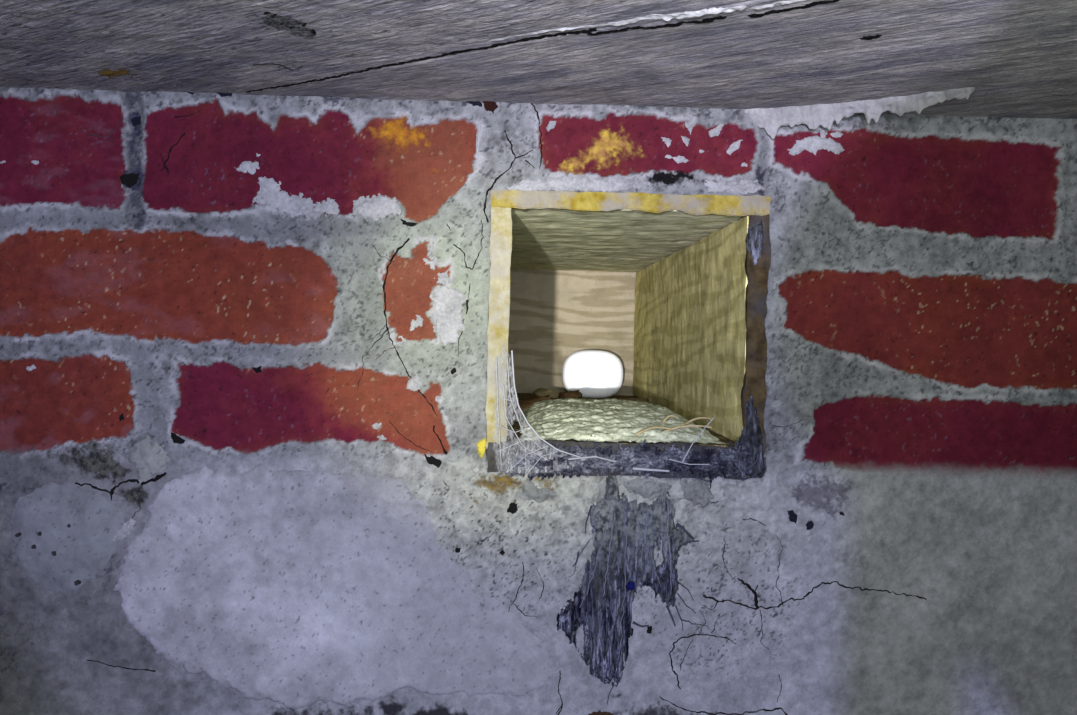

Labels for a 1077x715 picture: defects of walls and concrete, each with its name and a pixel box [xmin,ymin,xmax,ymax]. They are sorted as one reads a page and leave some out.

crack [245,0,839,93]
spalling [466,101,498,114]
peeling [661,115,704,163]
peeling [709,124,724,137]
peeling [353,193,418,227]
crack [447,103,542,357]
peeling [423,257,452,285]
crack [357,238,448,455]
peeling [398,315,423,344]
crack [75,472,167,526]
crack [508,562,544,618]
crack [660,518,927,715]